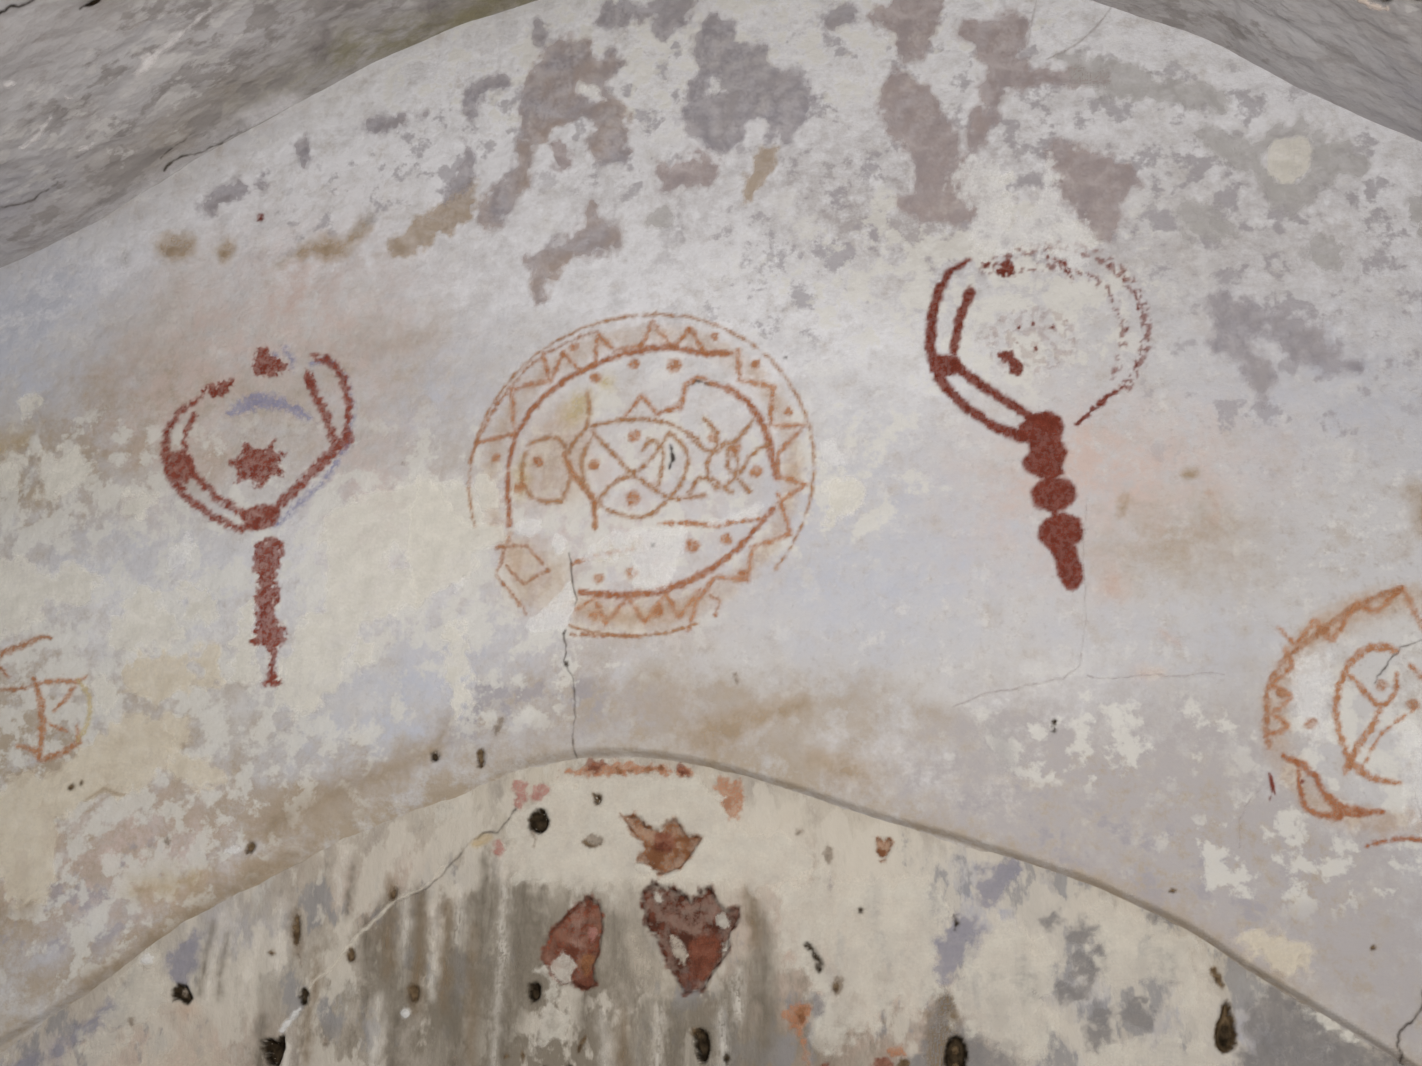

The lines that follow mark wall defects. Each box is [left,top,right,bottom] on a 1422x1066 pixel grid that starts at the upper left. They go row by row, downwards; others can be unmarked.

crack [0,0,33,14]
crack [80,0,100,9]
crack [1358,0,1389,11]
crack [164,140,223,171]
peeling [203,174,268,216]
peeling [389,0,812,257]
peeling [823,0,1229,225]
peeling [1045,142,1140,241]
peeling [523,200,621,305]
flaking render [529,895,604,1002]
flaking render [624,814,740,997]
crack [1397,1007,1422,1064]